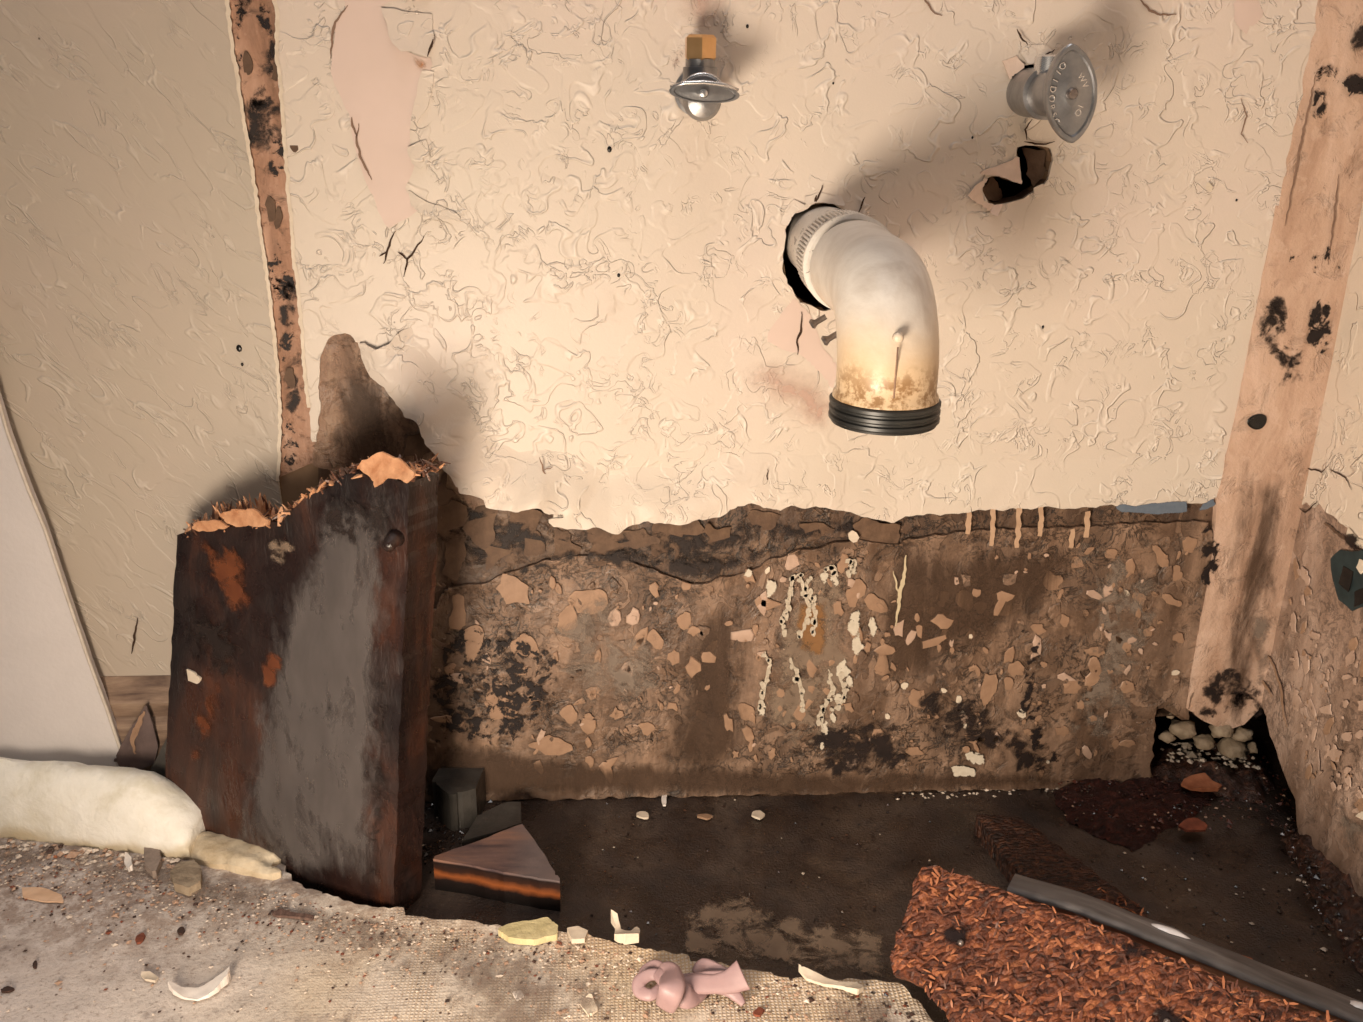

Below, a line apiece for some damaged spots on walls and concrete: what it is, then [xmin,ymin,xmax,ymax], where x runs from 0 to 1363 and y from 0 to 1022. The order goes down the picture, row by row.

mould [225,0,315,482]
peeling [312,0,1363,897]
damp [449,502,854,579]
damp [888,550,1059,677]
damp [1330,533,1363,611]
damp [427,601,1061,797]
peeling [580,994,598,1017]